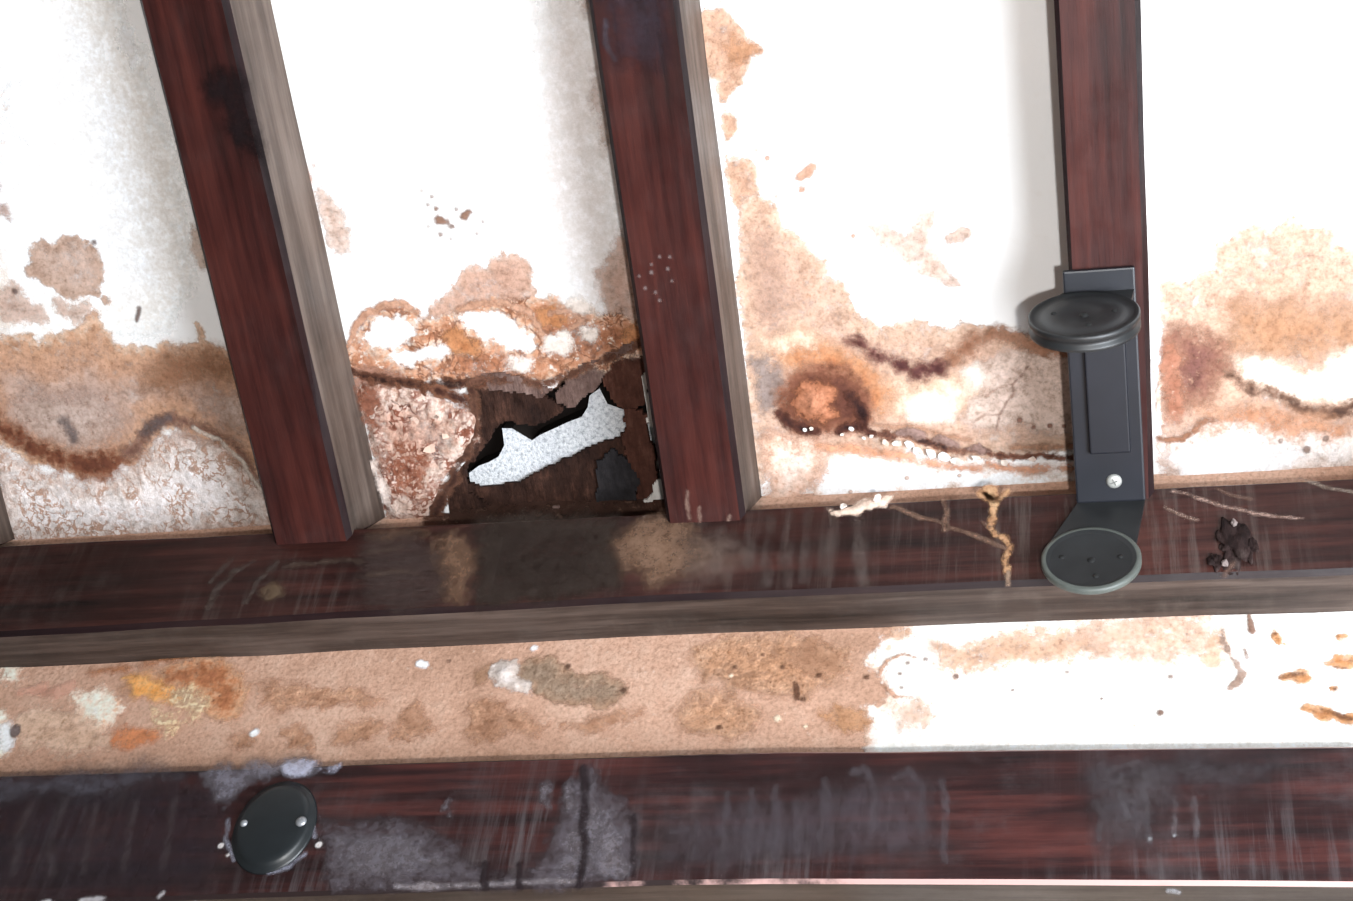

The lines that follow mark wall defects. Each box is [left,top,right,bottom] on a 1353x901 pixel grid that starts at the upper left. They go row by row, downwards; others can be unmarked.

leakage [0,0,271,540]
leakage [427,252,538,320]
rust [775,363,877,440]
leakage [701,8,1075,498]
leakage [1156,216,1353,476]